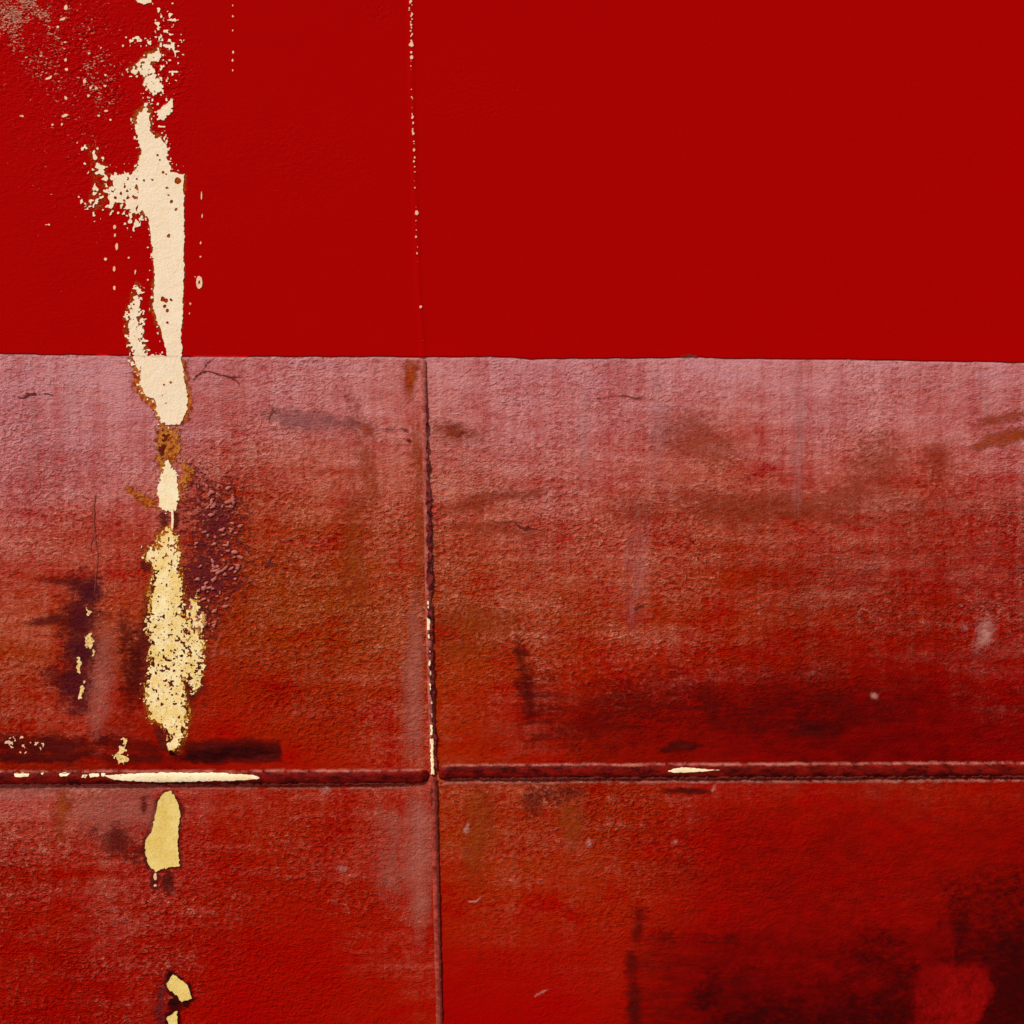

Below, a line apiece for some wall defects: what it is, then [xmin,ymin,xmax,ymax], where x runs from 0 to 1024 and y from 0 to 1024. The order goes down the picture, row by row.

peeling [77,0,202,429]
rust [122,423,195,529]
water stain [26,578,102,714]
peeling [130,460,209,755]
peeling [59,737,259,893]
peeling [153,971,195,1024]